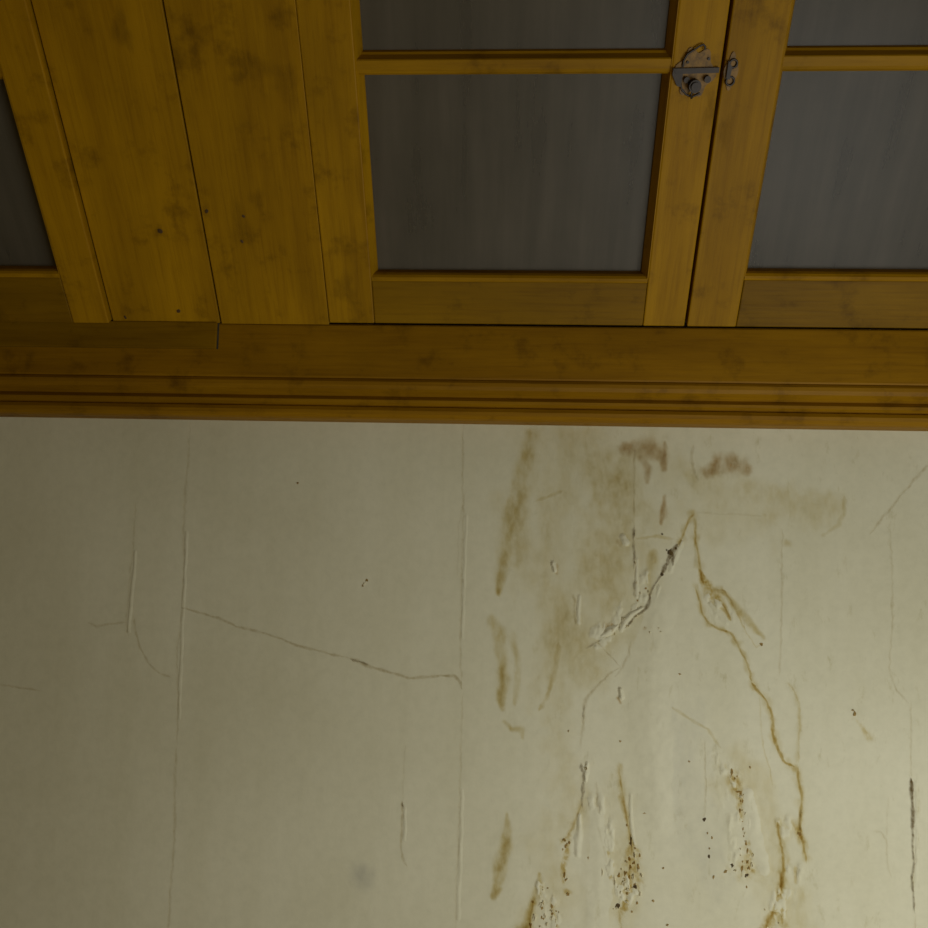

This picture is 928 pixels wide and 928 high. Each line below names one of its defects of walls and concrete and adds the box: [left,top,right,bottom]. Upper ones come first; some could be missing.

crack [576,533,685,638]
crack [581,761,590,783]
damp [529,887,559,928]